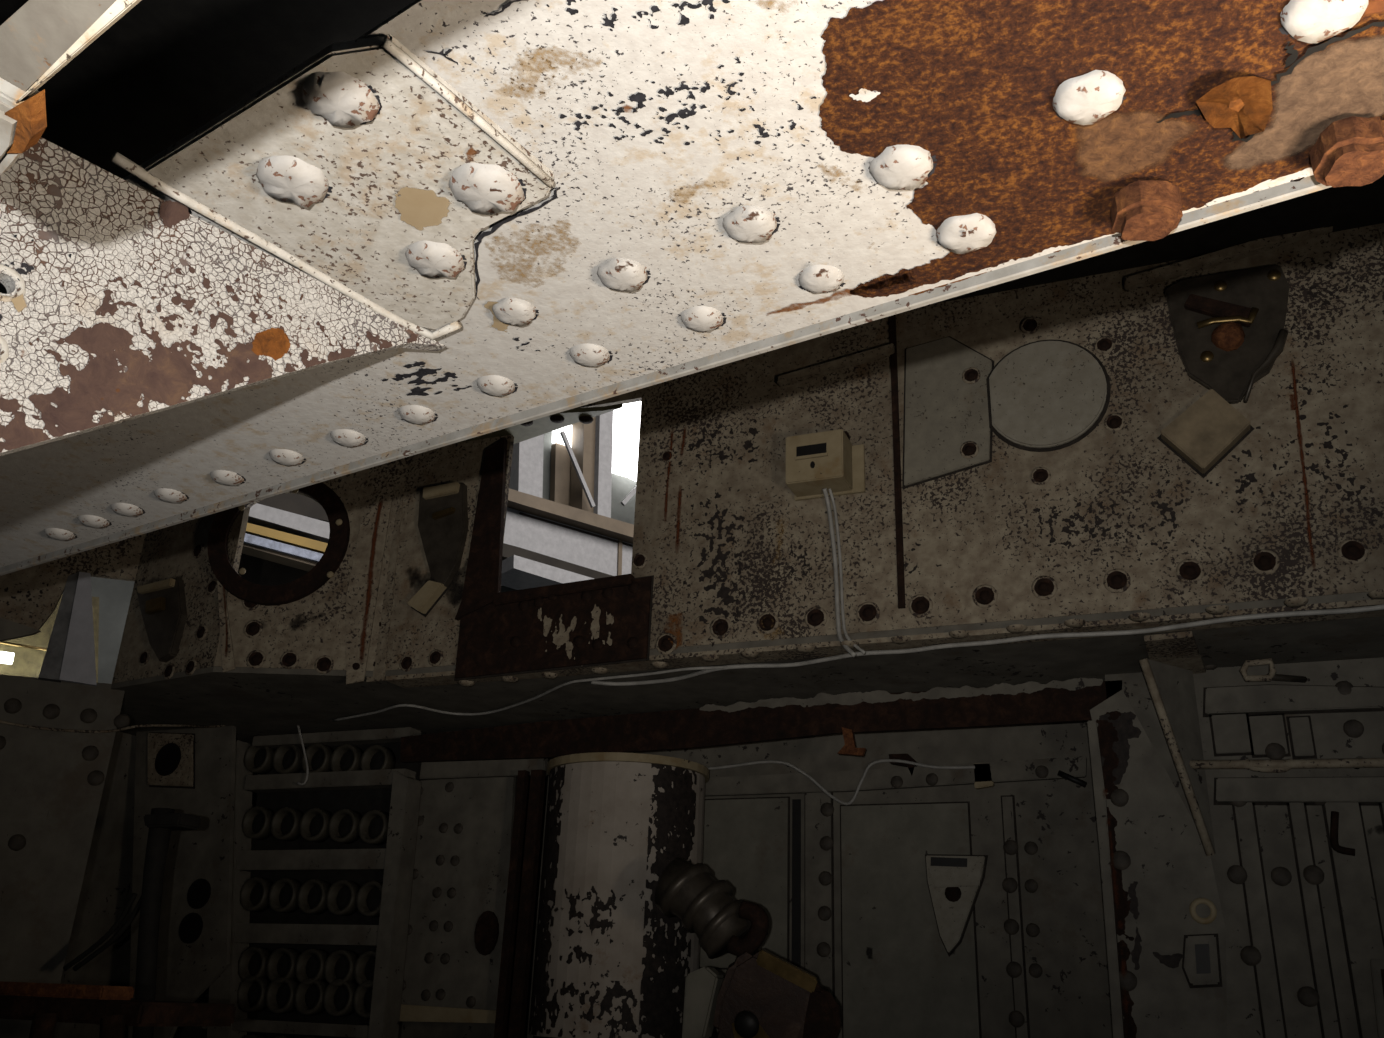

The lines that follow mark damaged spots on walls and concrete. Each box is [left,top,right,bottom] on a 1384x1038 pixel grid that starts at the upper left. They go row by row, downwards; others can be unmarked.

peeling [602,0,730,35]
peeling [560,51,820,154]
rust [768,0,1384,314]
crack [474,187,560,300]
rust [0,322,417,453]
peeling [537,608,552,652]
peeling [588,612,614,646]
peeling [528,764,697,1038]